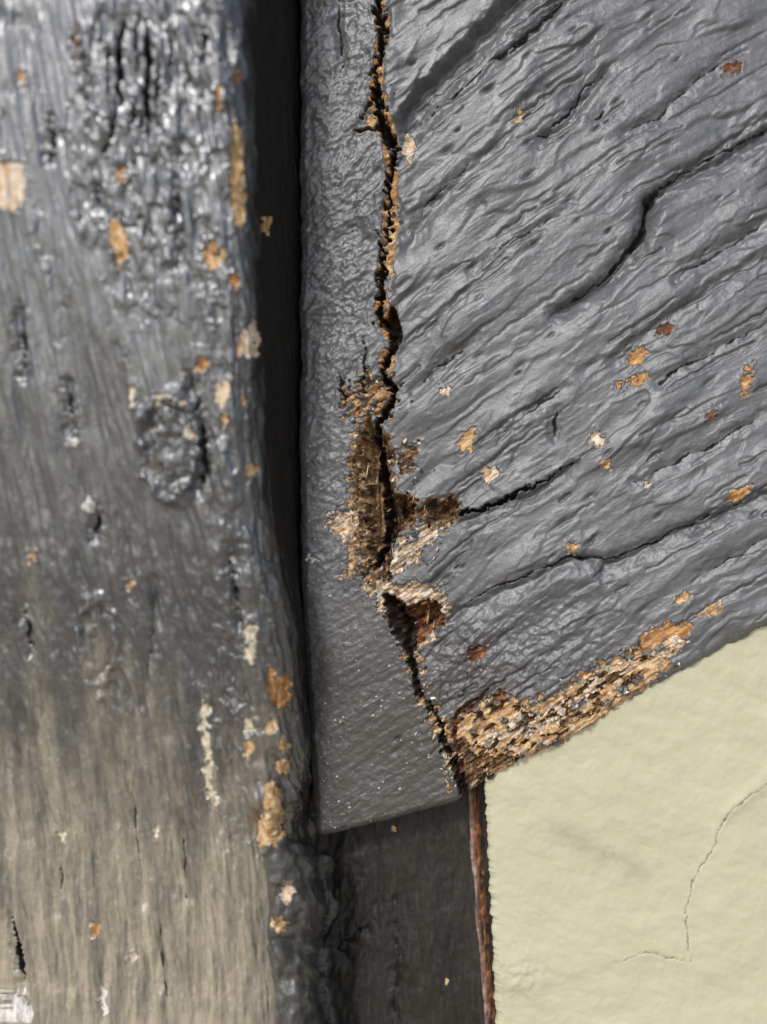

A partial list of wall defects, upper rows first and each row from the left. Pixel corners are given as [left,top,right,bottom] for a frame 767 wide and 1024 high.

peeling [0,161,26,212]
peeling [227,122,248,231]
crack [322,0,767,796]
peeling [243,667,294,852]
peeling [427,599,723,788]
crack [624,783,767,972]